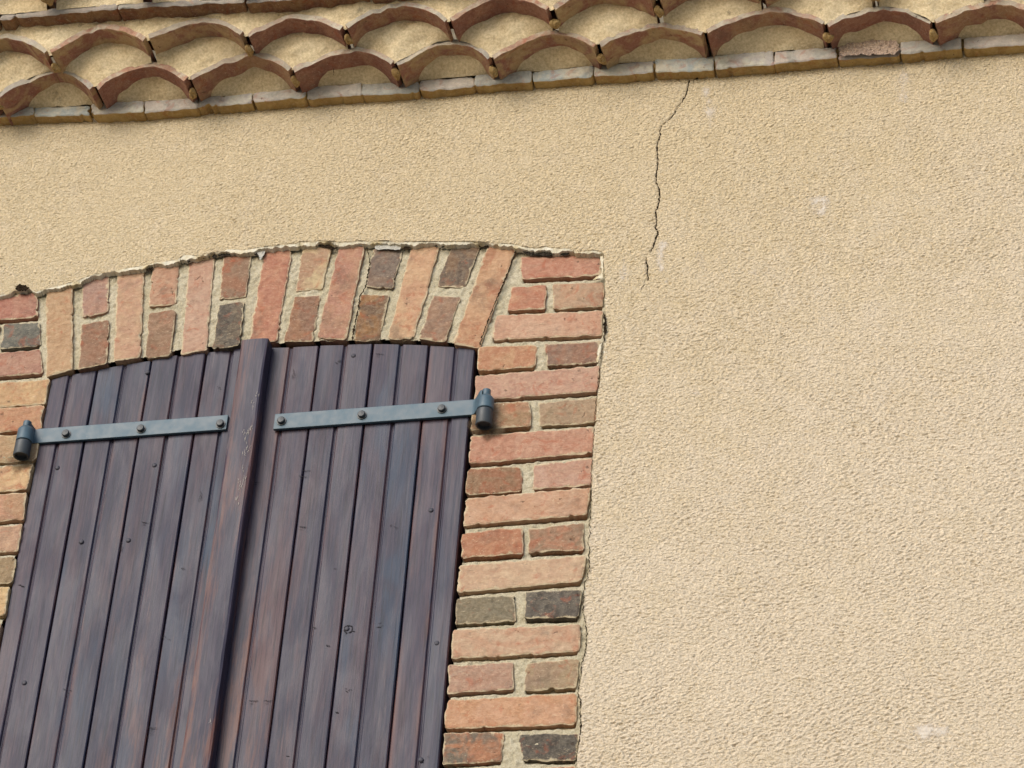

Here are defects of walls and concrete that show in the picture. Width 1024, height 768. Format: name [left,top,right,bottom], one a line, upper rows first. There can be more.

crack [640,80,694,292]